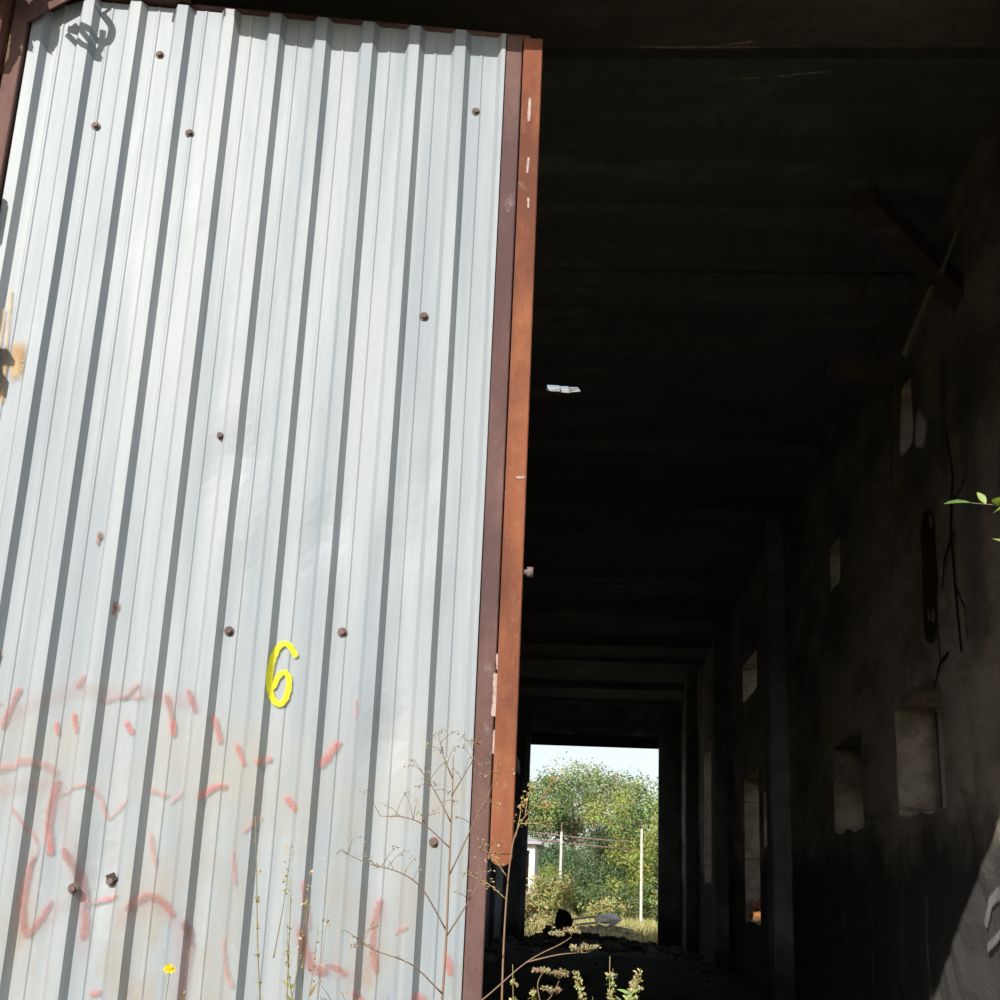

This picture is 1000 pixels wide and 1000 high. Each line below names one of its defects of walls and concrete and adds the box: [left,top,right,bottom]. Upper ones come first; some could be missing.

rust [0,290,24,402]